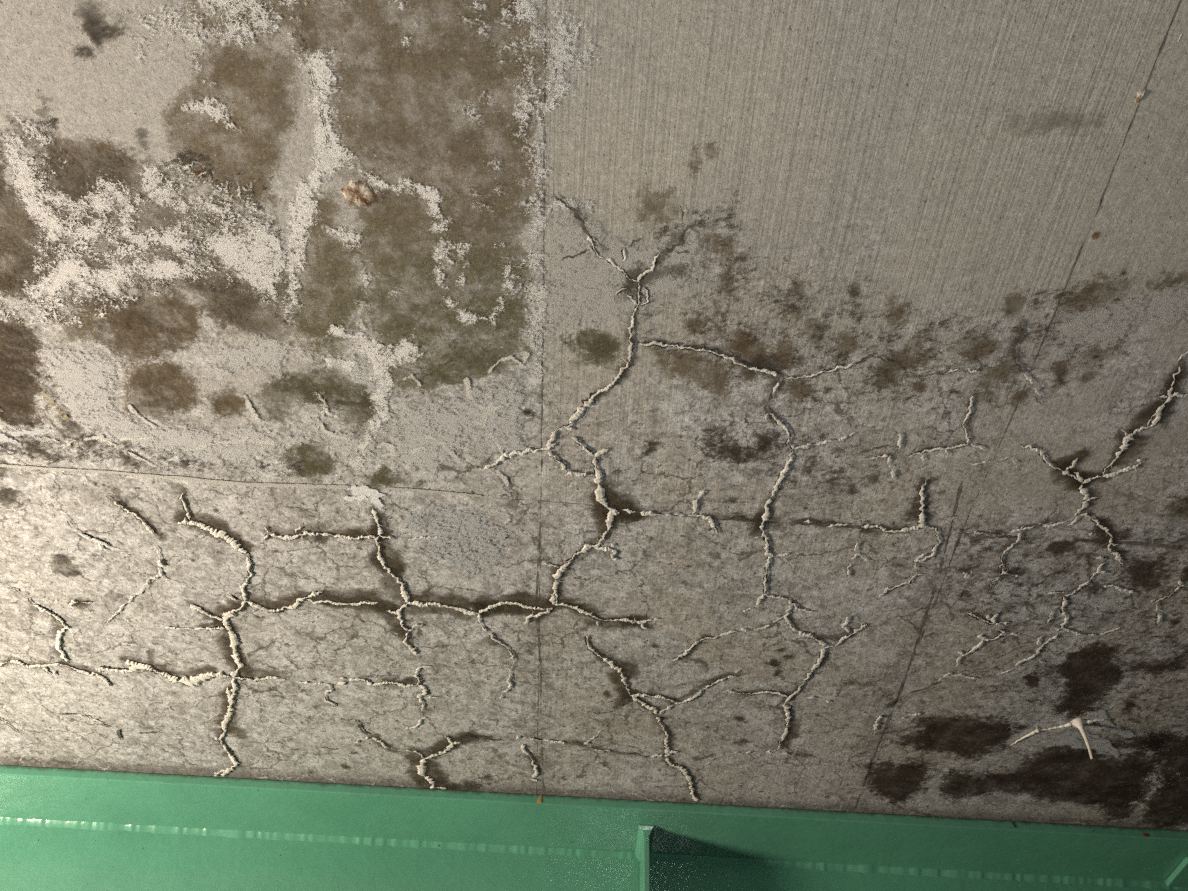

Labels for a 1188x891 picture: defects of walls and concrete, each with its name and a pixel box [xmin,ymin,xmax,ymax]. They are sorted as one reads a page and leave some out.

damp [0,0,1188,580]
crack [0,194,1188,801]
damp [767,648,792,677]
damp [857,497,1188,829]